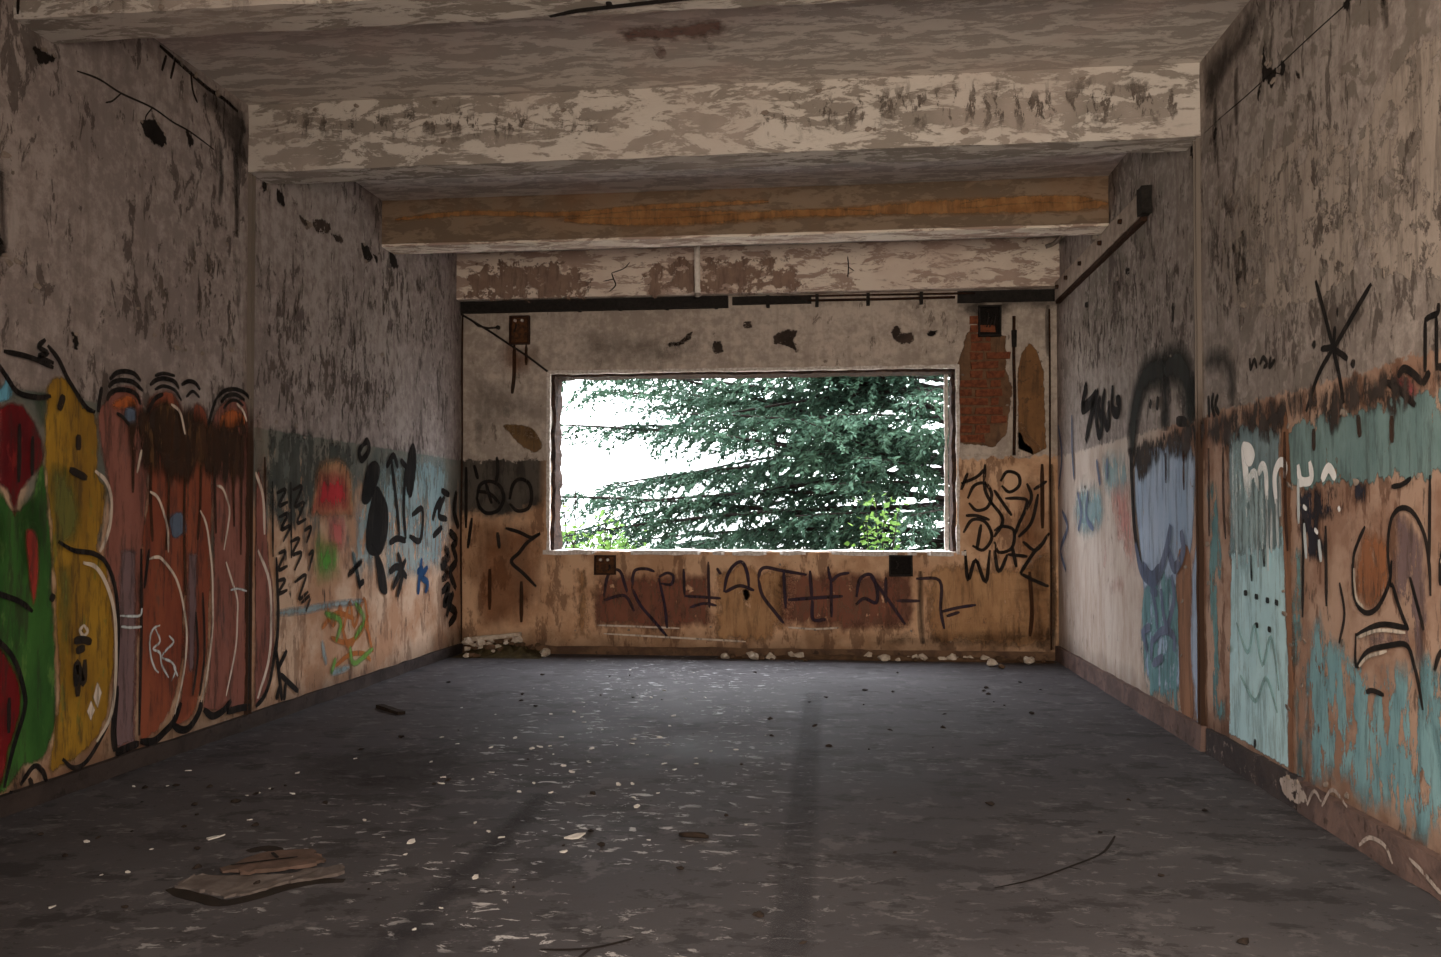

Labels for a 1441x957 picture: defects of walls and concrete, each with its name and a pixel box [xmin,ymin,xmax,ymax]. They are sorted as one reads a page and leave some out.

crack [549,0,688,18]
flaking render [33,46,56,65]
peeling [404,101,538,144]
peeling [807,76,1177,134]
water stain [1207,22,1252,155]
water stain [211,97,246,233]
peeling [462,259,593,303]
peeling [639,252,803,299]
flaking render [956,316,1047,458]